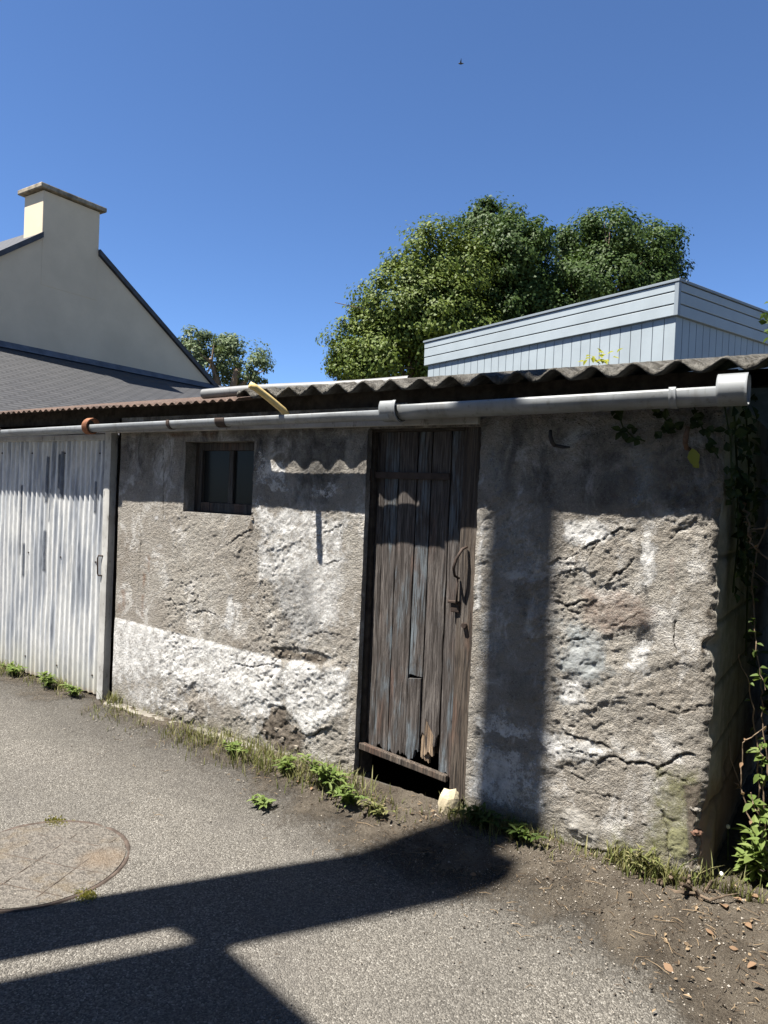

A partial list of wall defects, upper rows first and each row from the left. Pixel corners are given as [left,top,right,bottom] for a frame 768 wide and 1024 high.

crack [556,522,628,576]
crack [565,732,692,796]